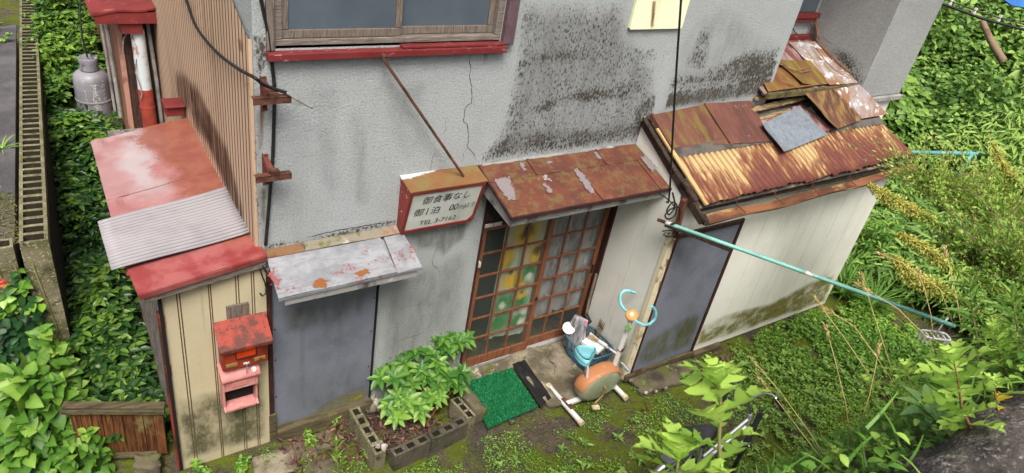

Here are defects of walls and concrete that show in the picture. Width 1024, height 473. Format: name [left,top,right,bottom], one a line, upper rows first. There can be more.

damp [486,8,779,160]
crack [430,54,475,169]
peeling [495,176,517,200]
peeling [574,168,594,193]
corrosion [313,278,328,288]
mould [184,399,253,452]